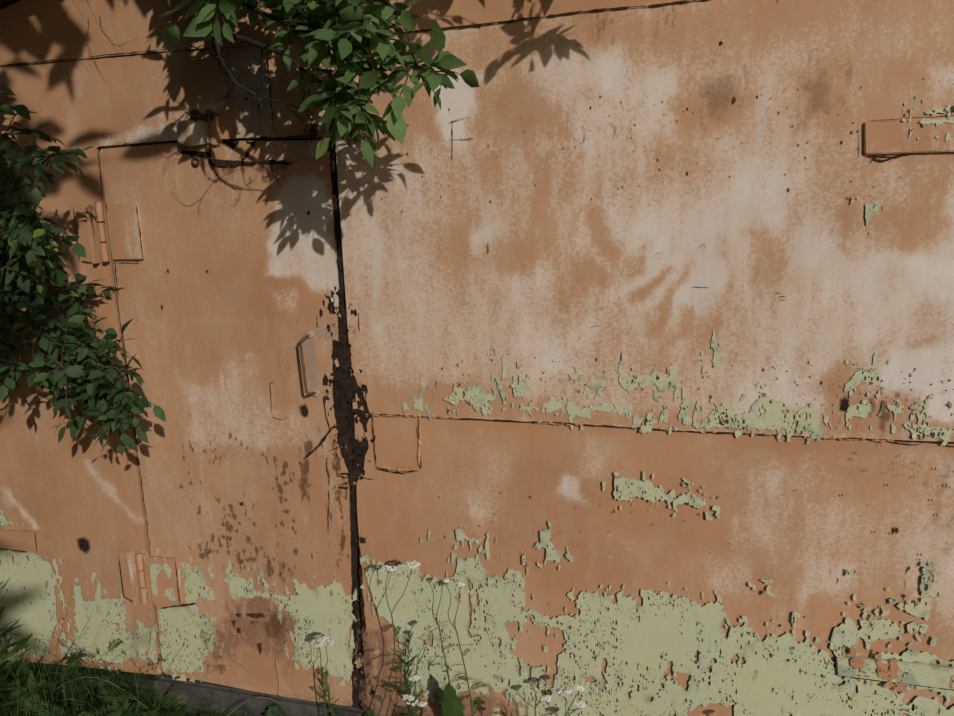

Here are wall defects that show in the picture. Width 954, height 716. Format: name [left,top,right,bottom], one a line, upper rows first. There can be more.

peeling [0,519,954,716]